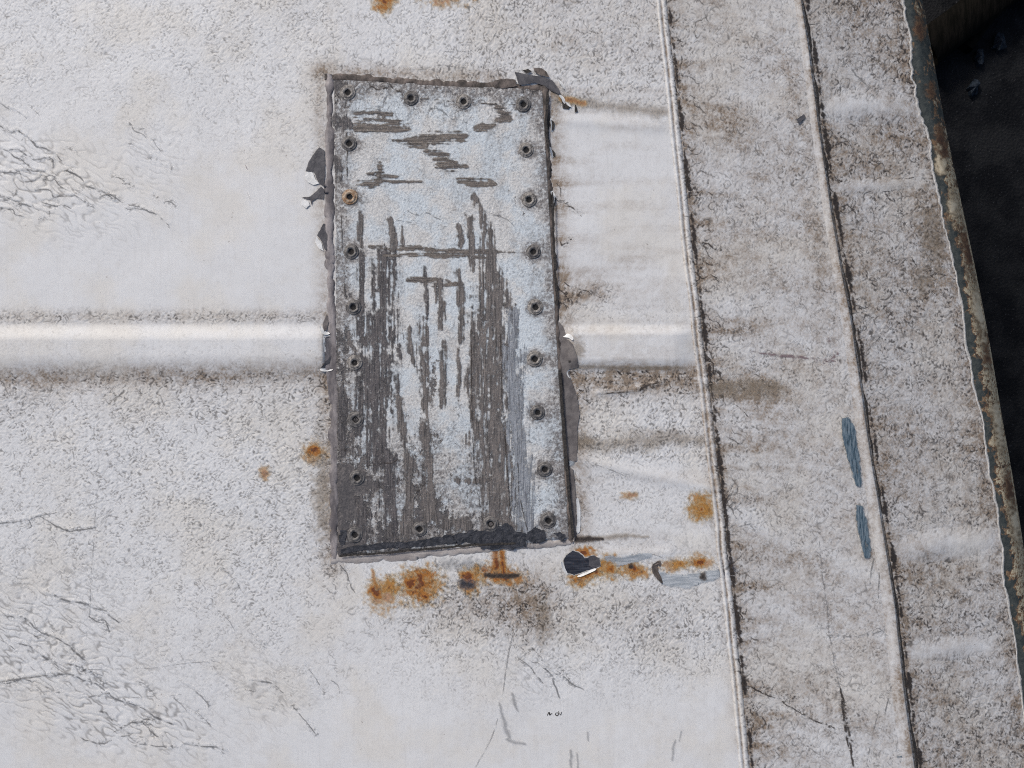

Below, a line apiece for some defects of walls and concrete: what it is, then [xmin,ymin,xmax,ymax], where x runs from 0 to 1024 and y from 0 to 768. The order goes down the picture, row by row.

rust [372,0,397,14]
peeling [492,68,578,112]
peeling [301,147,342,208]
peeling [320,103,539,549]
rust [303,443,325,463]
peeling [558,321,581,542]
rust [688,492,713,521]
rust [367,563,445,611]
rust [459,549,526,595]
rust [568,546,648,588]
rust [661,554,712,572]